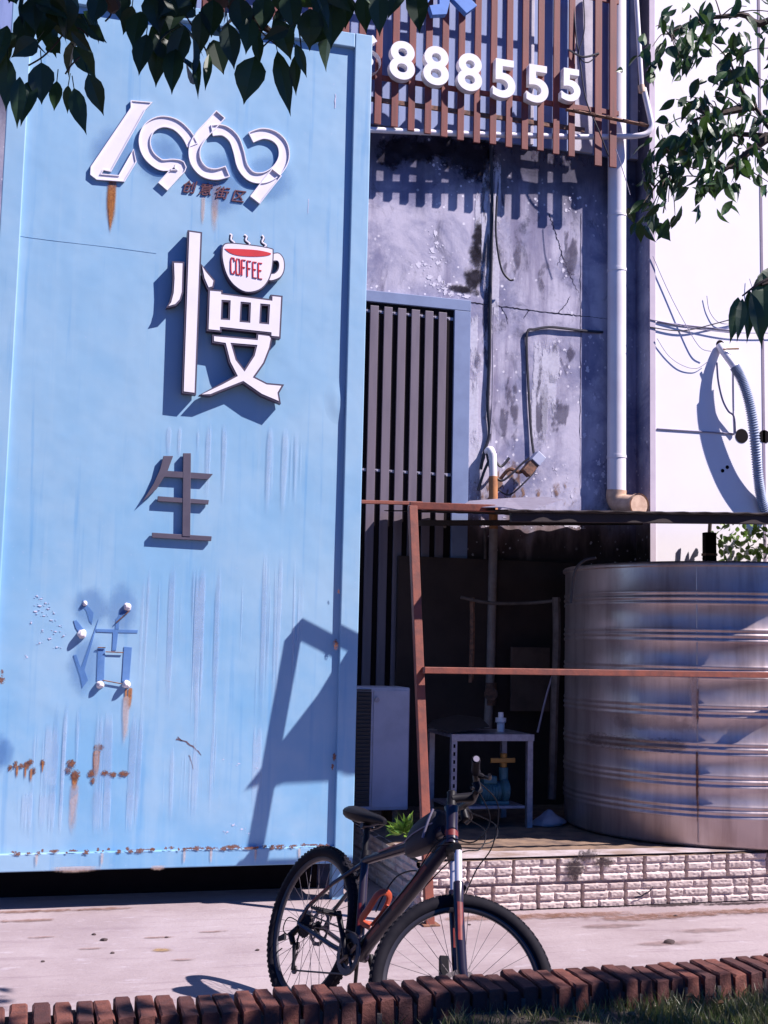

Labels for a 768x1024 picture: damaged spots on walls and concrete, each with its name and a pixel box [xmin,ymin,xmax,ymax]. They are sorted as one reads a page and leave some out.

rust [107,181,116,228]
peeling [411,226,471,299]
damp [563,233,577,273]
damp [377,135,521,493]
crack [471,214,605,483]
damp [531,341,575,441]
rust [8,759,45,780]
rust [65,744,129,788]
rust [11,843,329,856]